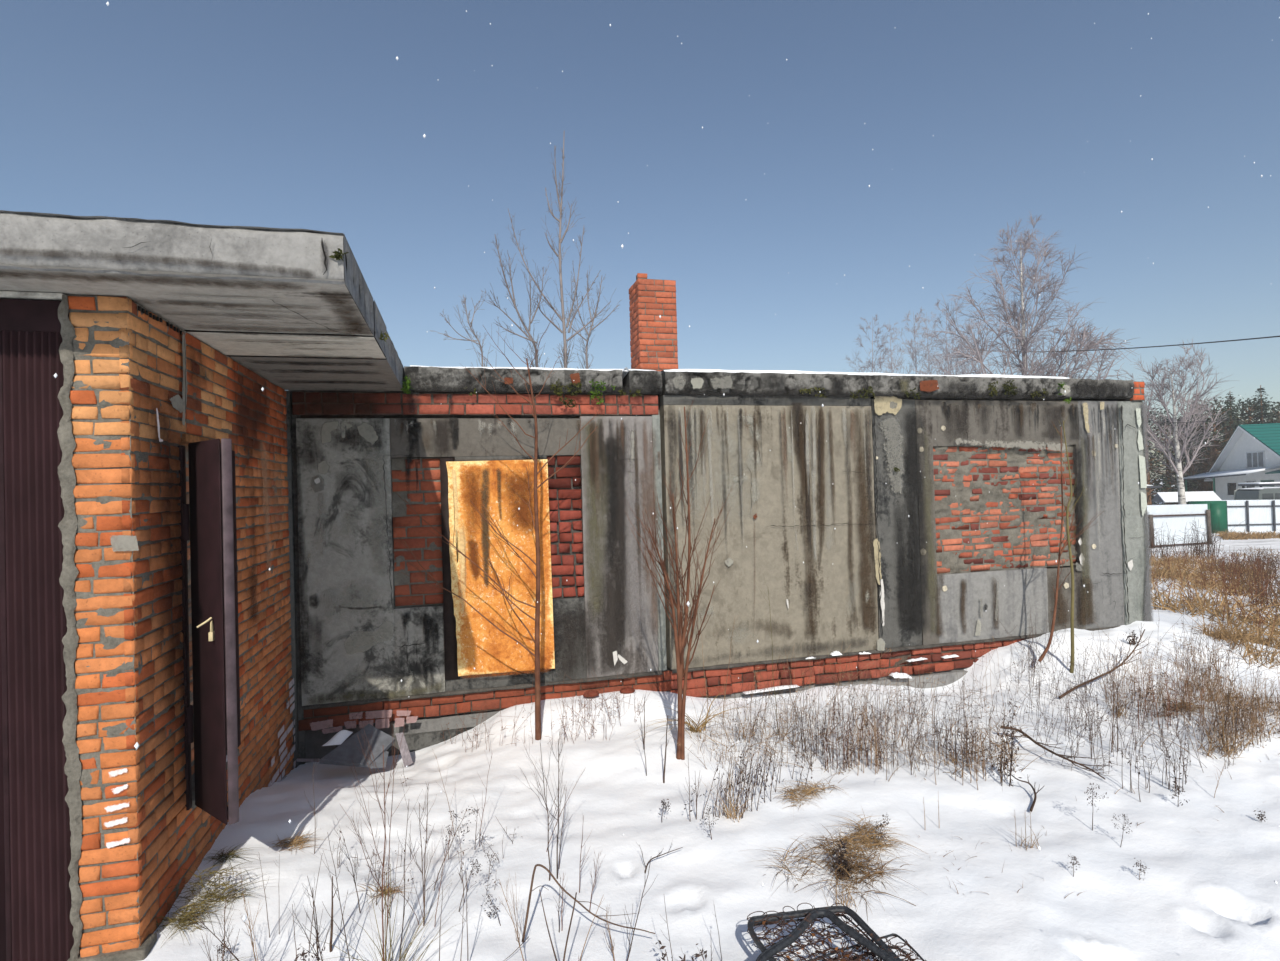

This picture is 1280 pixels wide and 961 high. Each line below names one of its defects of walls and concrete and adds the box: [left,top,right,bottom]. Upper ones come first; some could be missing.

water stain [0,243,384,384]
water stain [156,333,196,649]
water stain [268,432,321,787]
water stain [336,425,382,451]
water stain [312,612,441,703]
water stain [401,417,458,484]
rust [466,469,533,585]
rust [465,668,548,678]
water stain [560,420,647,674]
peeling [873,538,885,651]
spalling [874,396,905,493]
water stain [669,377,1132,651]